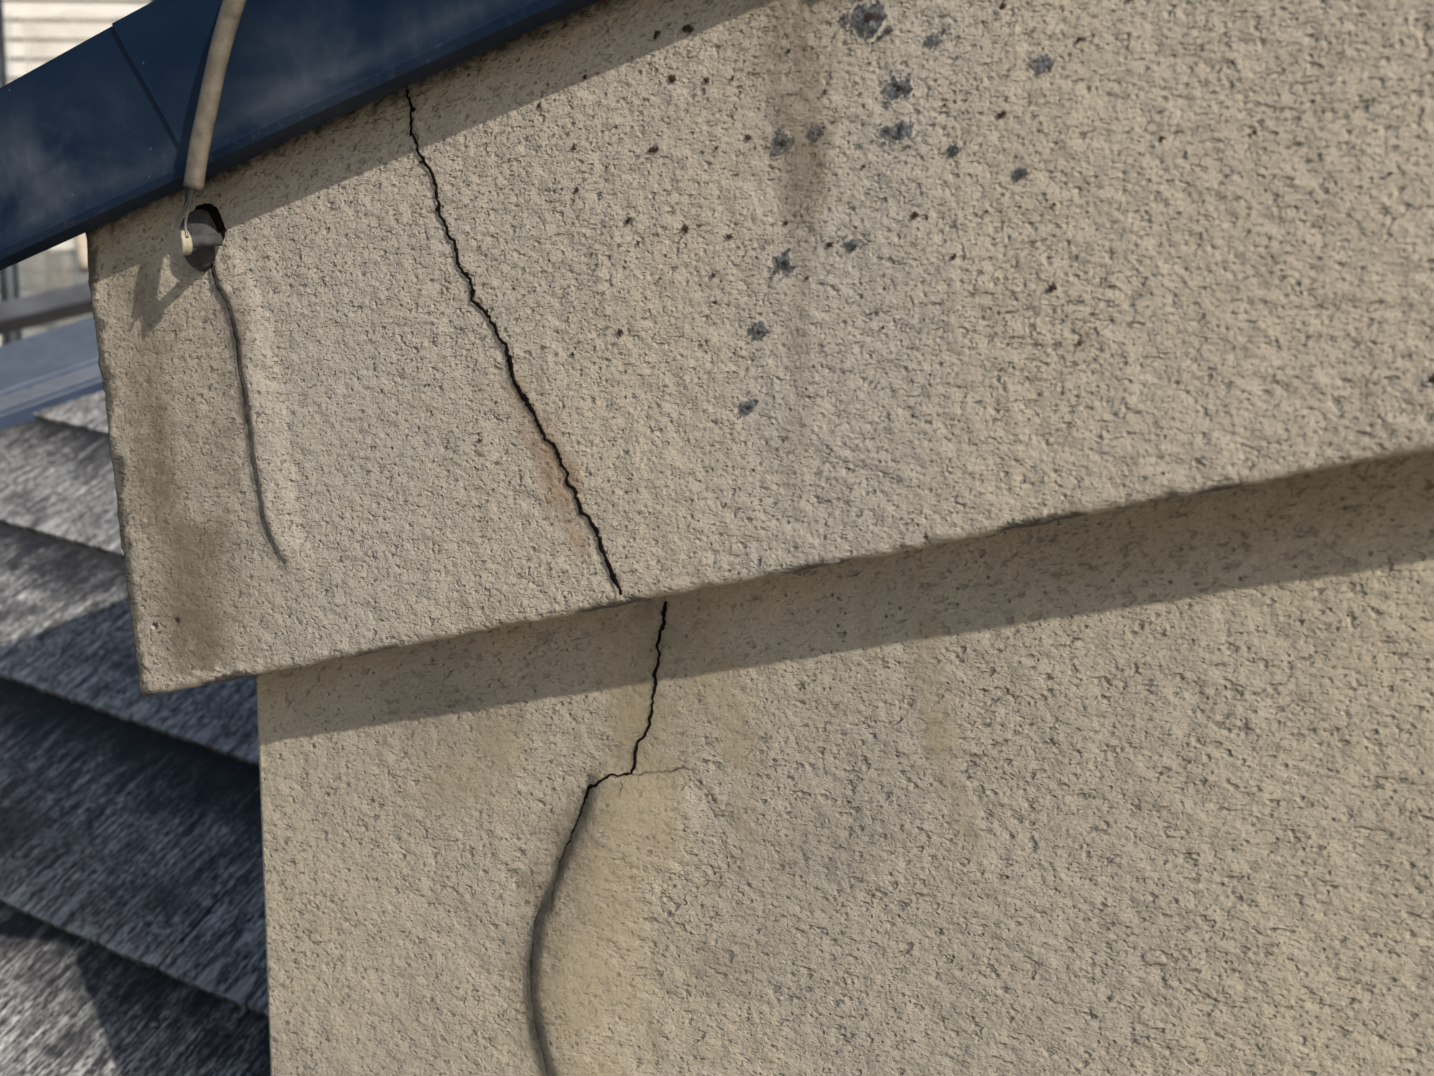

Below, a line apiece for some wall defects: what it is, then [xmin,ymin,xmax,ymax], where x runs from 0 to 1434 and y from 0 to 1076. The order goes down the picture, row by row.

crack [211,254,279,560]
crack [405,86,622,596]
crack [529,601,731,1073]